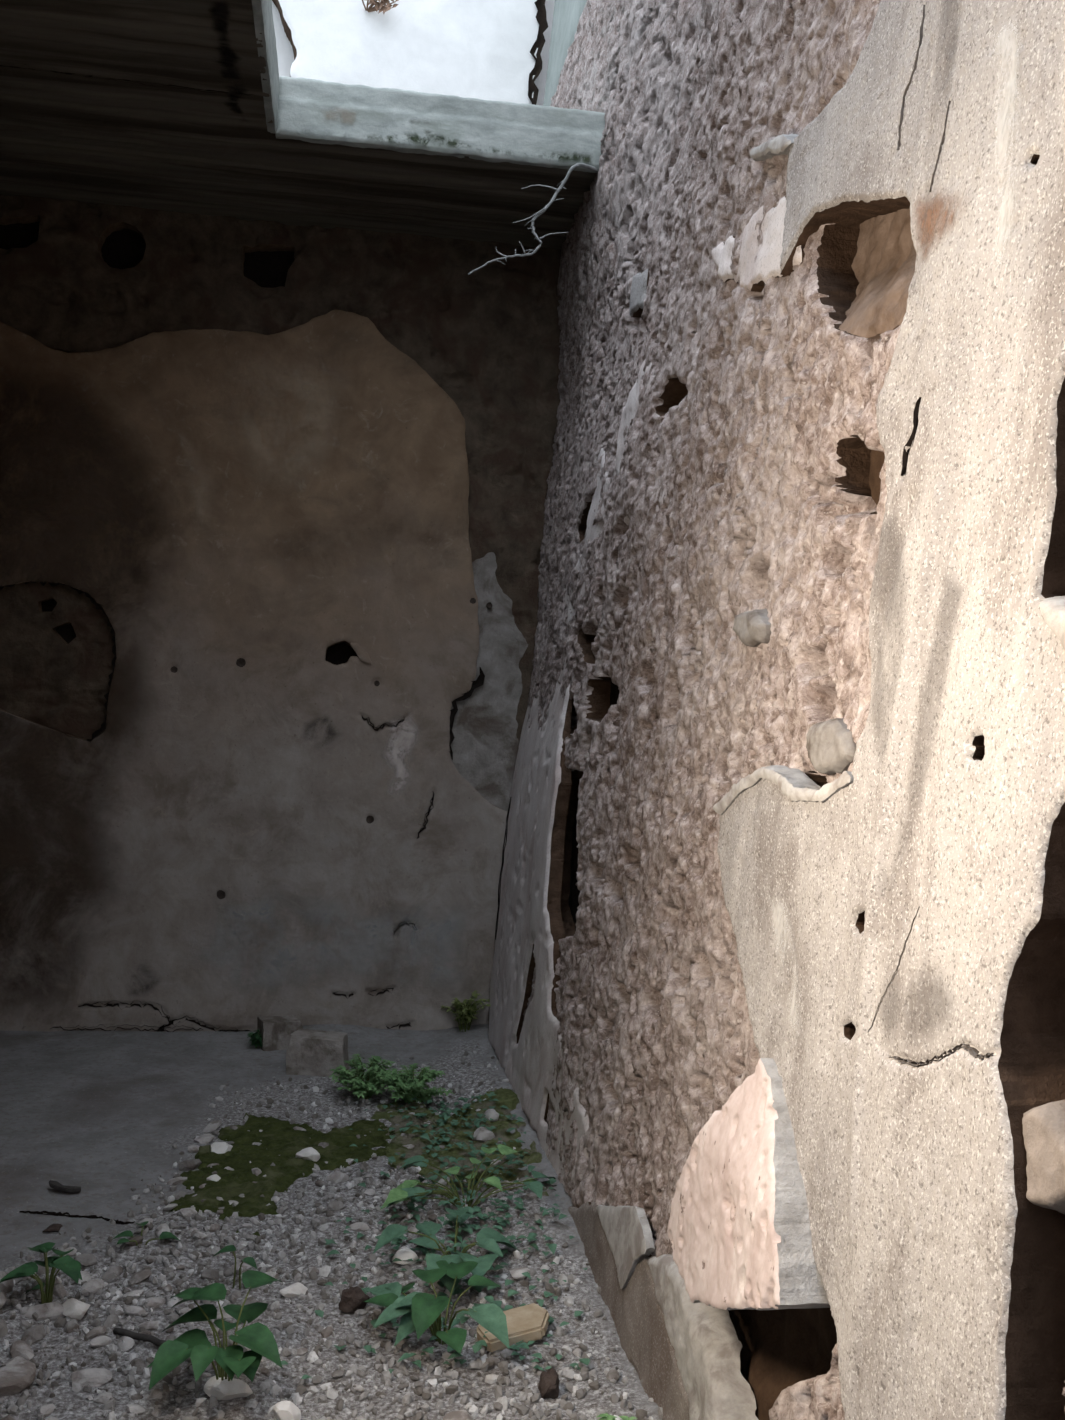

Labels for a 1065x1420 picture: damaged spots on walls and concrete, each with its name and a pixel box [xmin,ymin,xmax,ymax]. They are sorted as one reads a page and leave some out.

leakage [210,2,245,113]
crack [897,5,925,150]
crack [929,101,951,192]
crack [901,397,922,476]
spalling [0,0,917,1289]
crack [362,716,405,731]
crack [417,792,434,839]
crack [50,1000,250,1032]
crack [868,908,994,1066]
spalling [769,1343,845,1420]